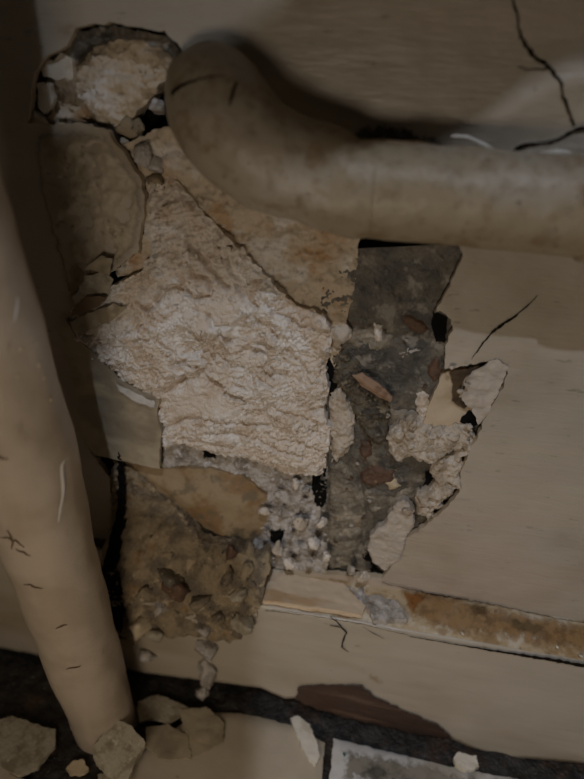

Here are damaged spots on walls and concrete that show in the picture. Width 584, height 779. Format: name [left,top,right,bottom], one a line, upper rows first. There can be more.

crack [512,0,584,151]
flaking render [30,25,509,583]
crack [472,296,537,358]
leakage [347,752,453,779]